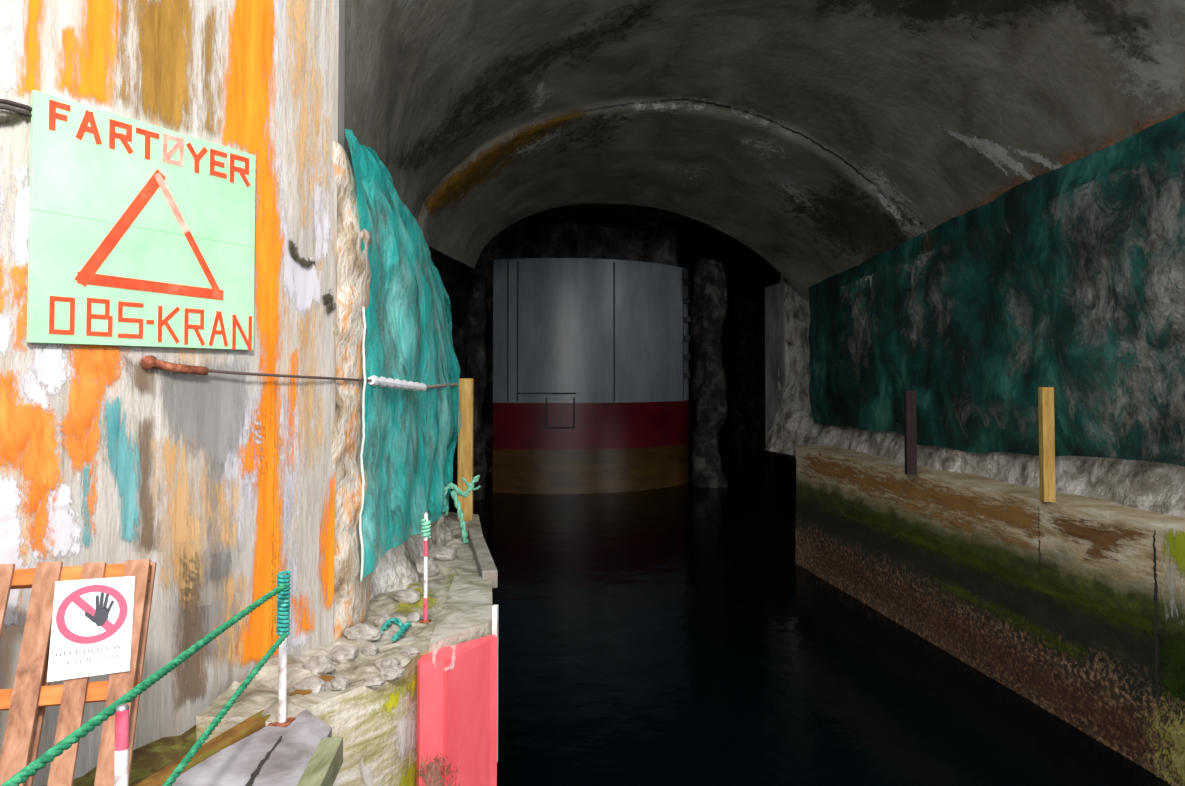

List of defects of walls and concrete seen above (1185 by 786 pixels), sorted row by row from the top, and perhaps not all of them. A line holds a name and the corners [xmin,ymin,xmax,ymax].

spalling [0,109,31,126]
rust [423,111,586,212]
peeling [0,146,30,270]
peeling [0,312,14,356]
peeling [19,343,76,411]
peeling [0,474,83,569]
peeling [4,589,24,628]
crack [245,736,282,786]